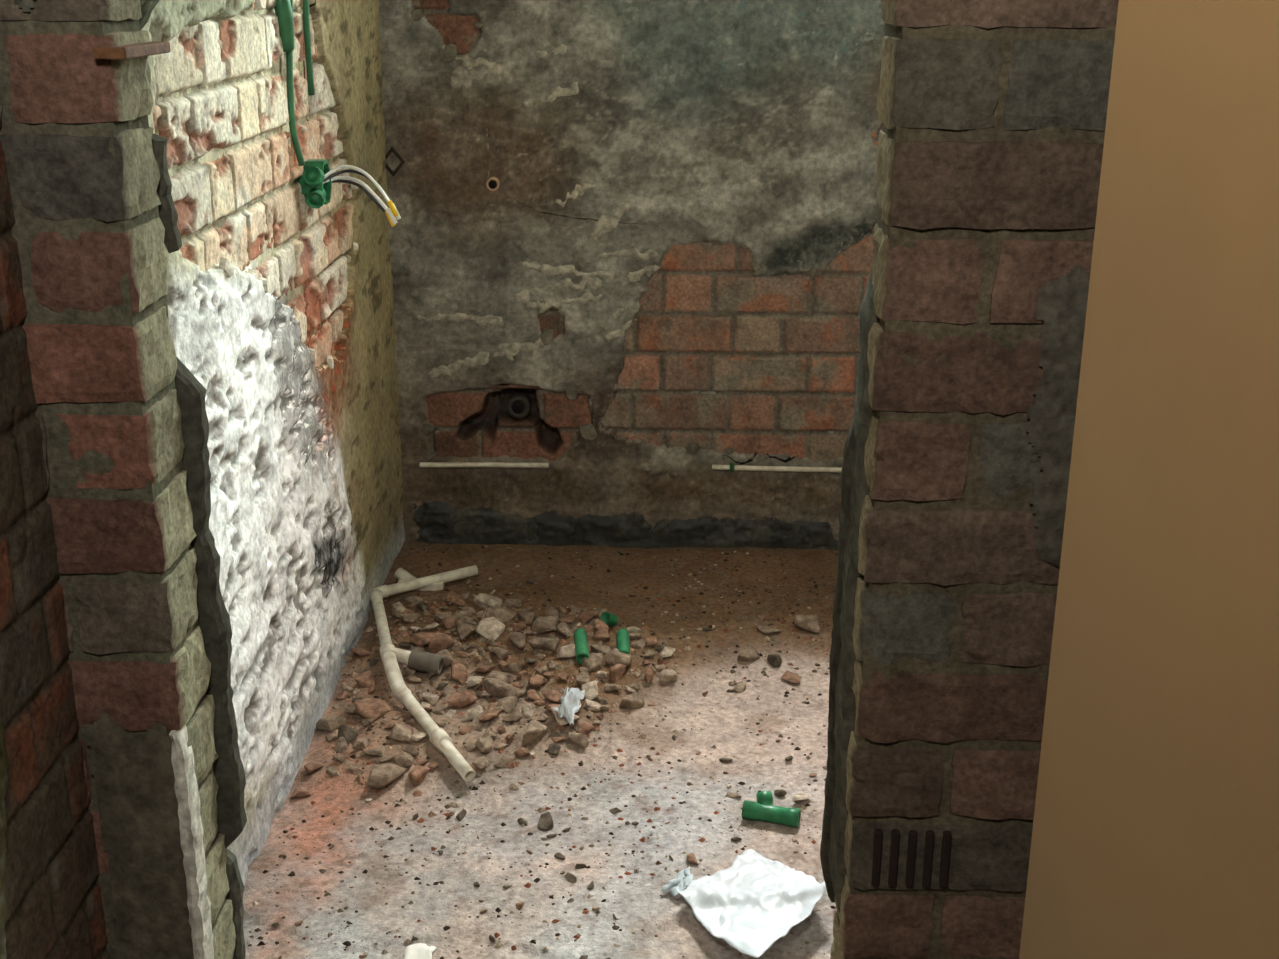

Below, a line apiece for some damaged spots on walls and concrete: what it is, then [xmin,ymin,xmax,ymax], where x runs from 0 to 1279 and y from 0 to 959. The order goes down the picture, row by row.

spalling [139,0,160,30]
spalling [410,0,485,63]
spalling [152,0,359,370]
leakage [272,303,329,463]
spalling [0,119,110,959]
leakage [313,524,347,591]
spalling [422,223,879,913]